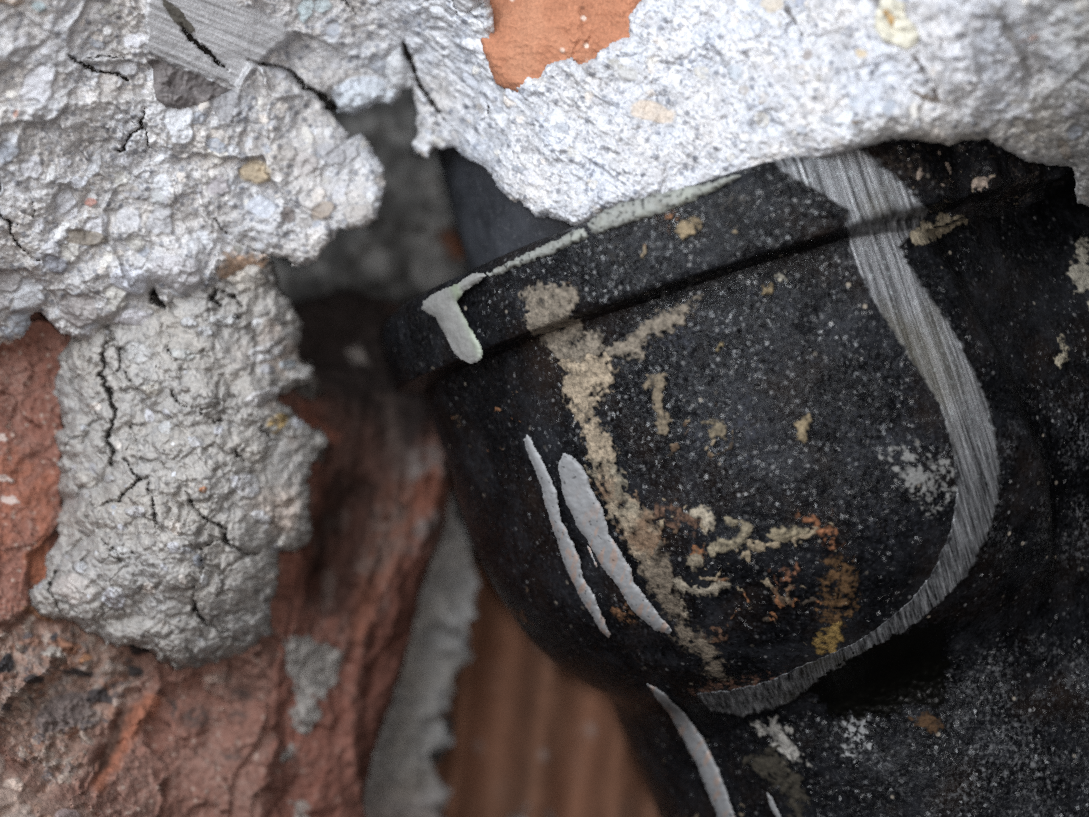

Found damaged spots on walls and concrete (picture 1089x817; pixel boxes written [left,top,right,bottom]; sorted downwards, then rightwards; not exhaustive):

crack [0,183,42,261]
crack [149,288,177,367]
crack [209,288,243,320]
crack [97,334,157,528]
crack [171,390,221,424]
crack [235,425,277,463]
crack [186,491,260,634]